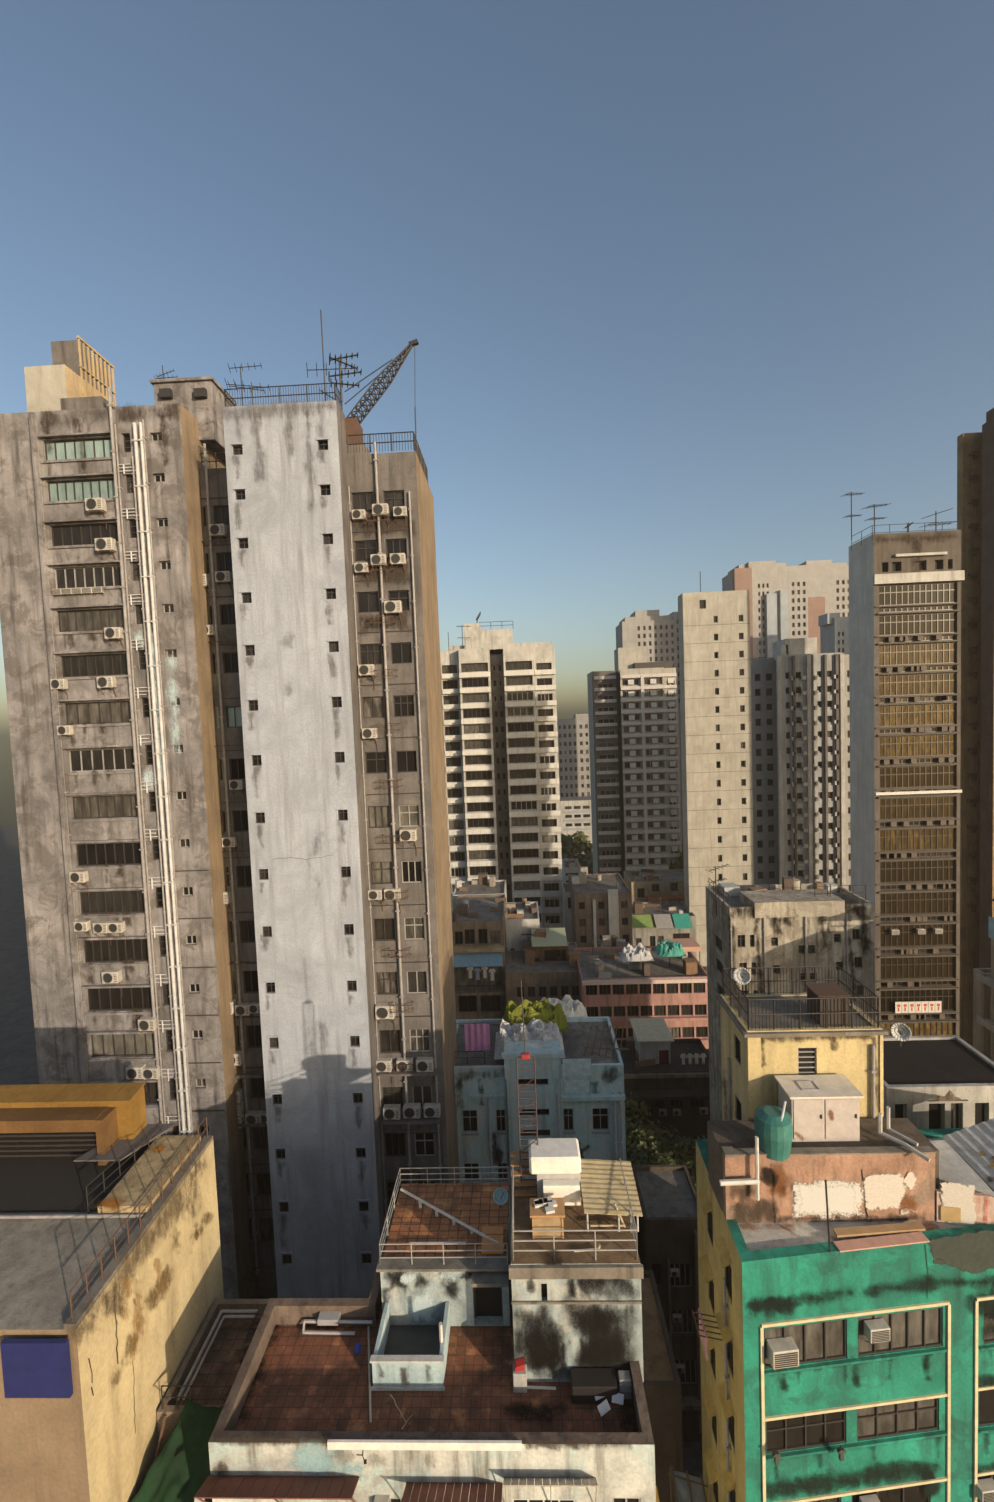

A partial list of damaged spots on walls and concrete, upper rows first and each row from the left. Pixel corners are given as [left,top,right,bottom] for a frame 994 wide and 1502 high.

peeling [792,1172,917,1219]
flaking render [928,1182,994,1274]
damp [546,1251,563,1265]
damp [513,1279,634,1378]
damp [748,1298,793,1316]
damp [923,1472,940,1498]